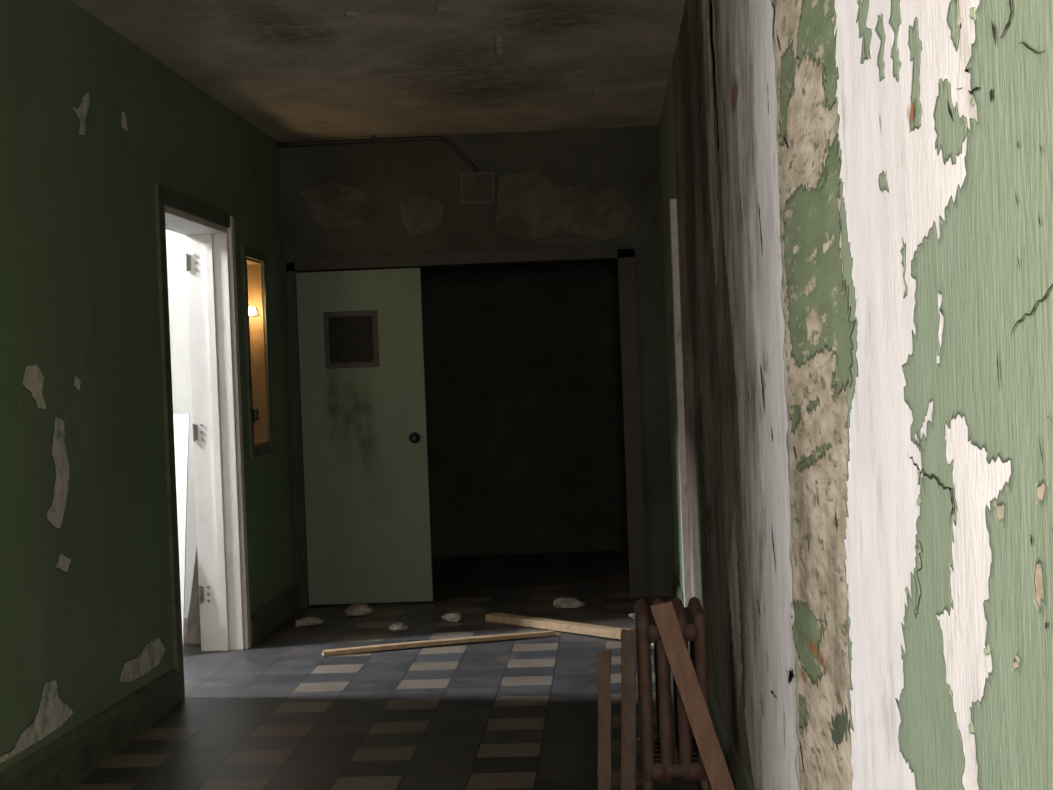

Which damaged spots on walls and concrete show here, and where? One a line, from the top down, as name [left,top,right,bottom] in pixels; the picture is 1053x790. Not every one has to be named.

crack [991,0,1045,54]
crack [958,87,993,102]
crack [997,284,1053,391]
peeling [672,0,1014,790]
peeling [1035,473,1049,510]
peeling [1030,534,1047,629]